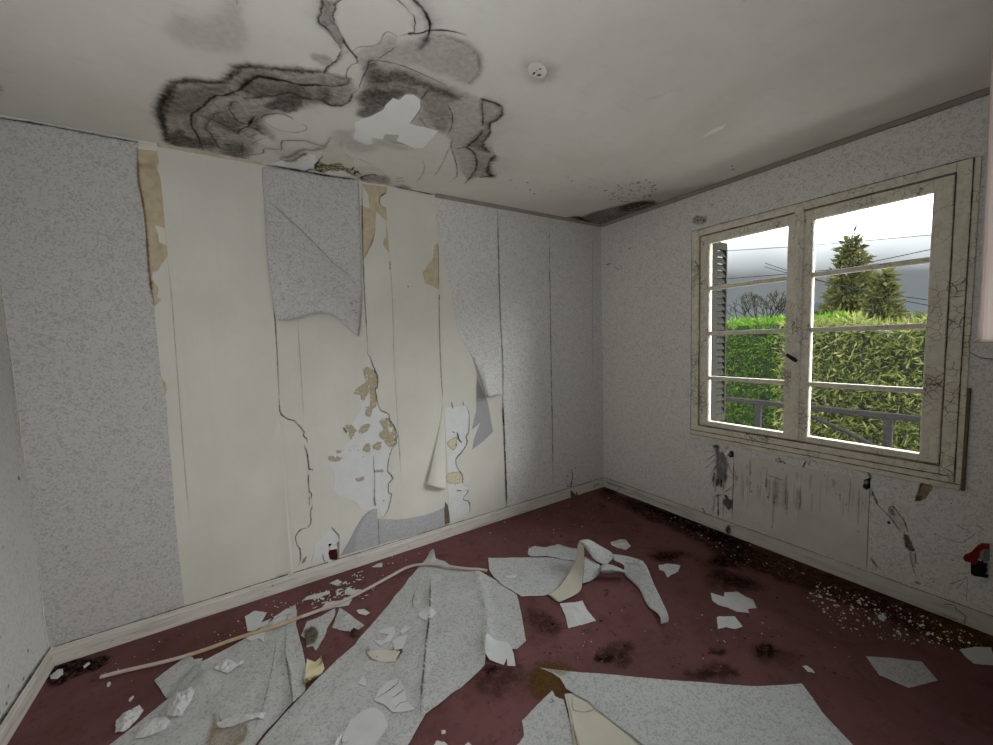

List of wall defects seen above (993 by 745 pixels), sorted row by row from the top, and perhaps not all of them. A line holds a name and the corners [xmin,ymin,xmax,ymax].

damp [156,40,451,155]
damp [456,99,503,180]
peeling [137,146,168,306]
peeling [423,243,439,290]
damp [569,181,656,224]
spalling [302,355,398,563]
spalling [427,402,470,521]
damp [702,446,732,515]
damp [628,499,993,649]